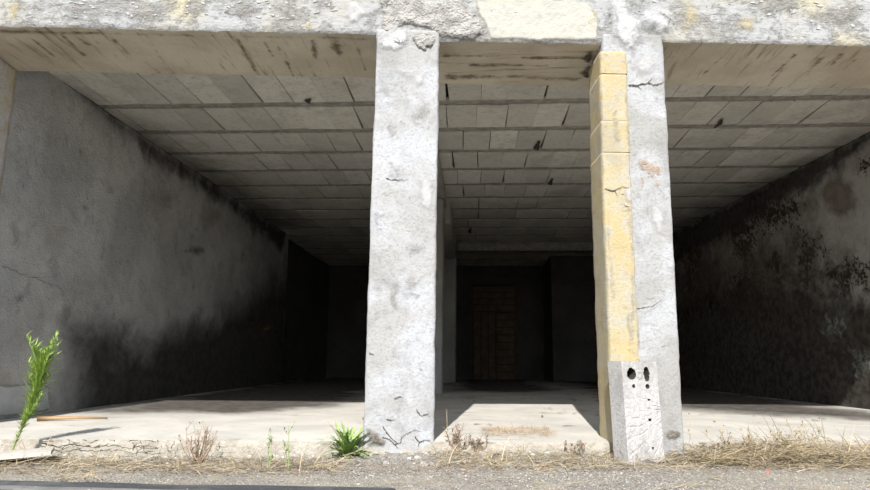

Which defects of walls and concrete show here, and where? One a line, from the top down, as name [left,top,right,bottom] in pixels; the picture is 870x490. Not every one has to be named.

spalling [380,0,483,49]
corrosion [636,159,661,187]
damp [823,178,855,214]
damp [675,186,870,317]
crack [40,439,175,453]
crack [382,396,430,448]